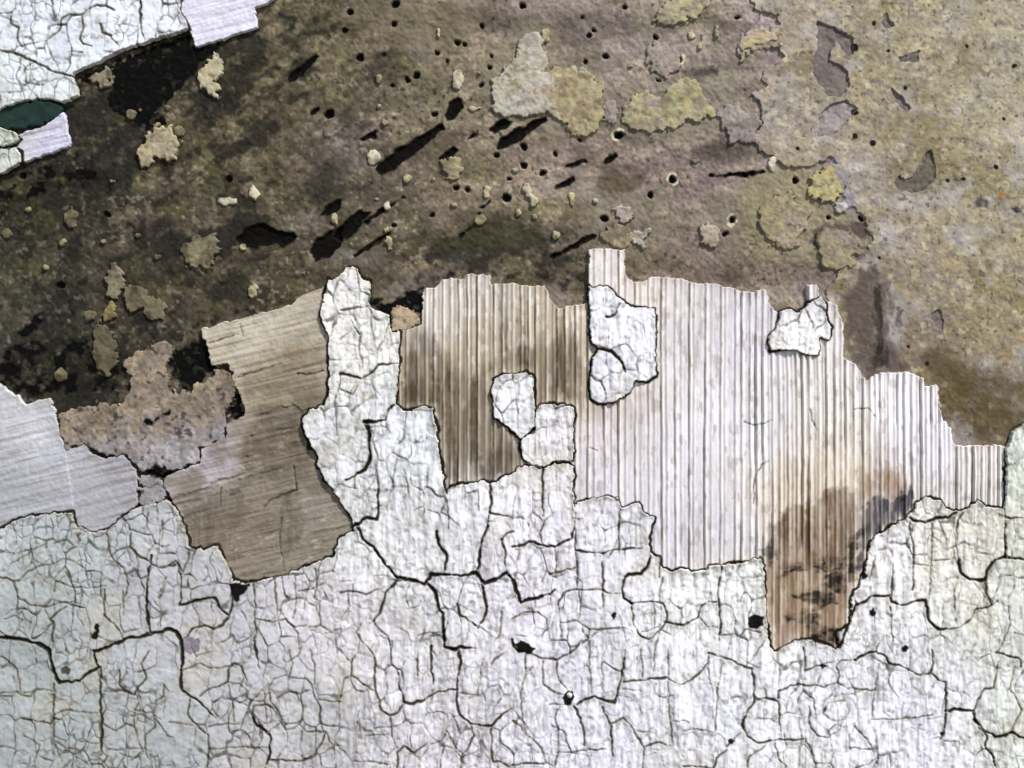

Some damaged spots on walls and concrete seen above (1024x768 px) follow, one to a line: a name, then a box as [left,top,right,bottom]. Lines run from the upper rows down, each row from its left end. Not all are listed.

crack [1,0,144,85]
peeling [0,223,1024,768]
crack [0,404,1024,768]
damp [862,486,913,540]